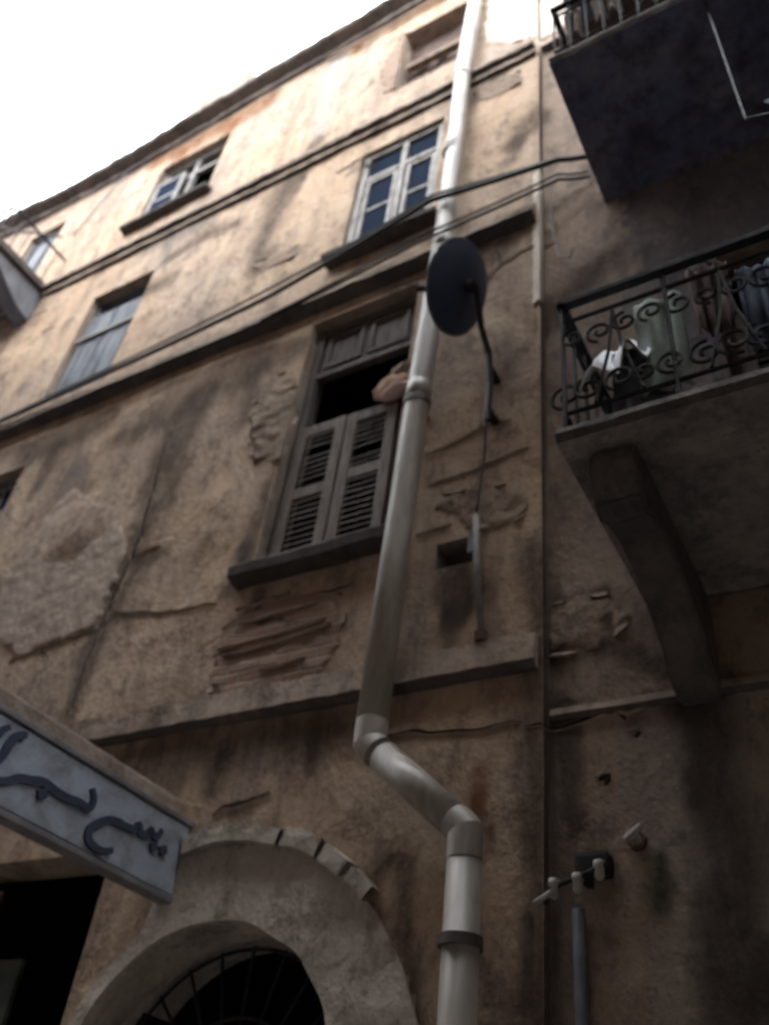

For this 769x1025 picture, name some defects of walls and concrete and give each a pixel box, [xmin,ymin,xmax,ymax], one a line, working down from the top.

crack [9,420,215,716]
damp [65,343,304,718]
flaking render [207,590,347,694]
crack [387,706,645,739]